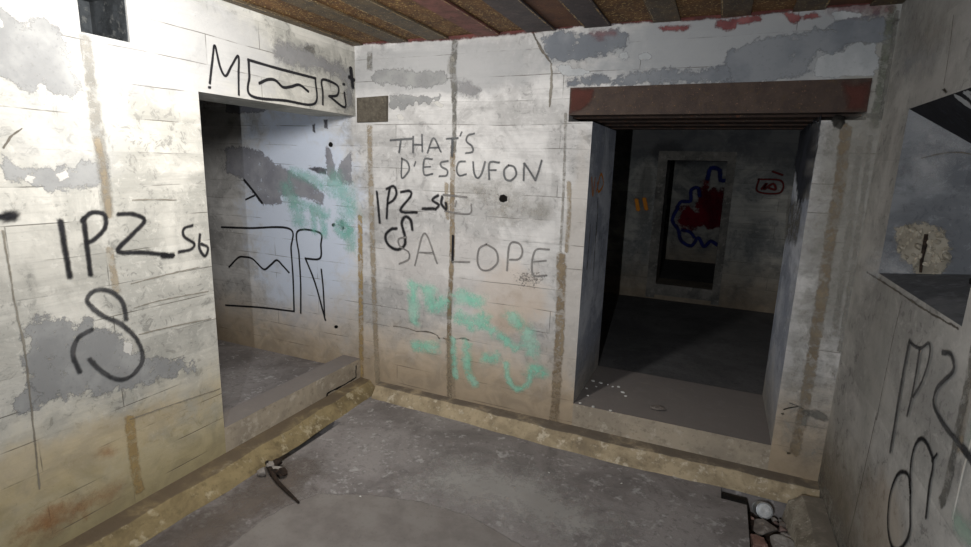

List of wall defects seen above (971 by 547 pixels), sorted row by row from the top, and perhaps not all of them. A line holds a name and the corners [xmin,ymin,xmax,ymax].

peeling [0,7,82,104]
peeling [518,0,893,87]
rust [564,89,593,128]
peeling [1,155,110,193]
rust [549,144,571,422]
peeling [13,314,196,415]
leakage [161,459,315,547]